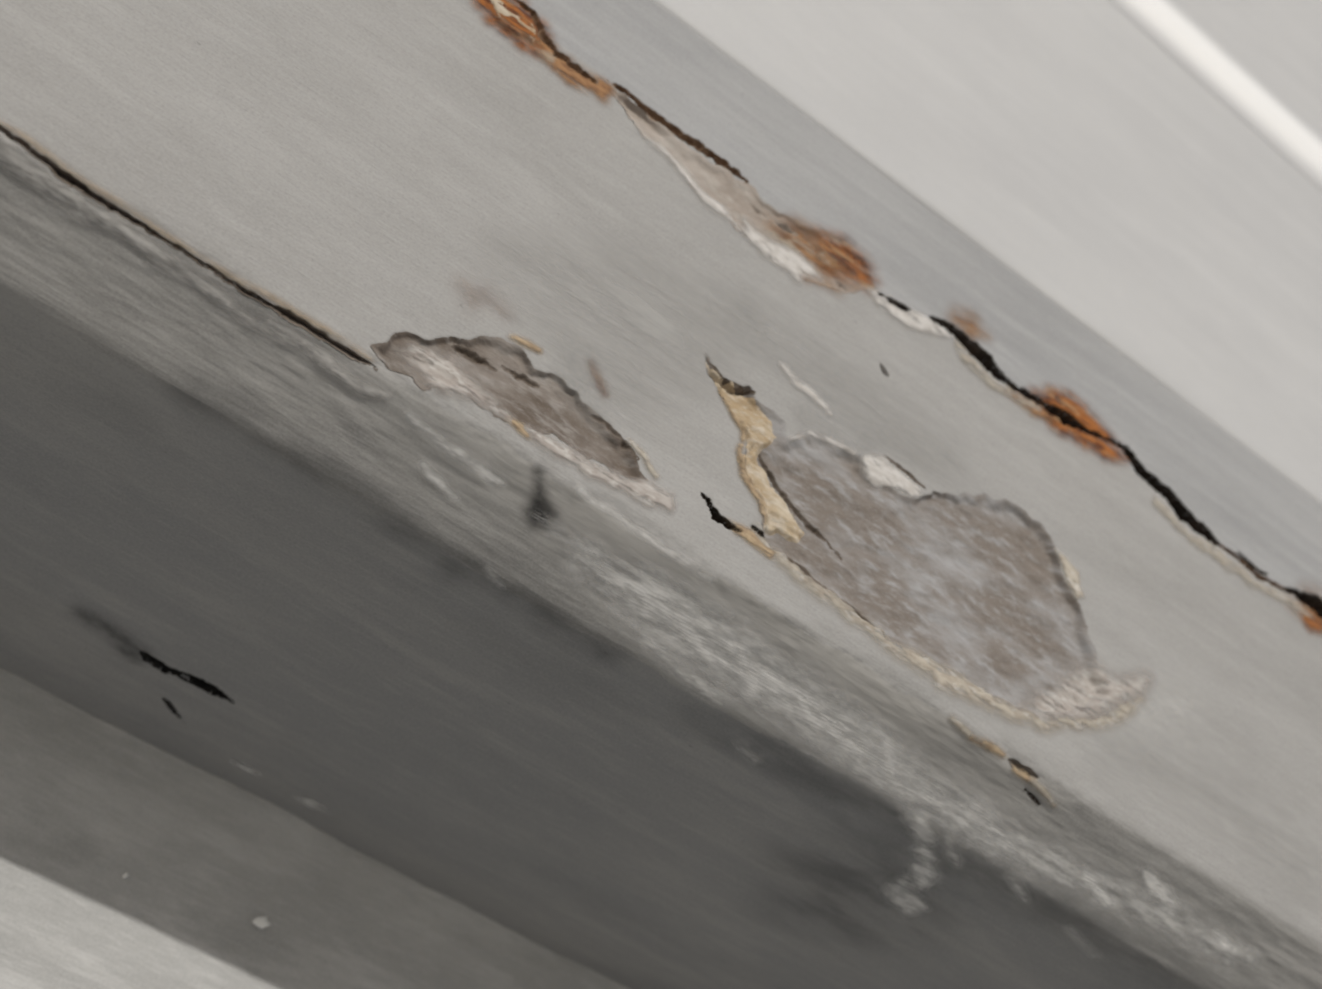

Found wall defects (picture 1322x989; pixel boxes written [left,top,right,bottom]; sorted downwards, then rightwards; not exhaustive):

corrosion [476,0,613,99]
crack [514,0,749,184]
crack [0,125,389,398]
spalling [597,80,1039,409]
corrosion [775,226,873,287]
crack [139,651,234,718]
spalling [370,332,674,511]
crack [701,492,776,558]
spalling [704,353,1150,730]
corrosion [1010,388,1126,460]
crack [878,293,1322,619]
corrosion [1300,608,1322,631]